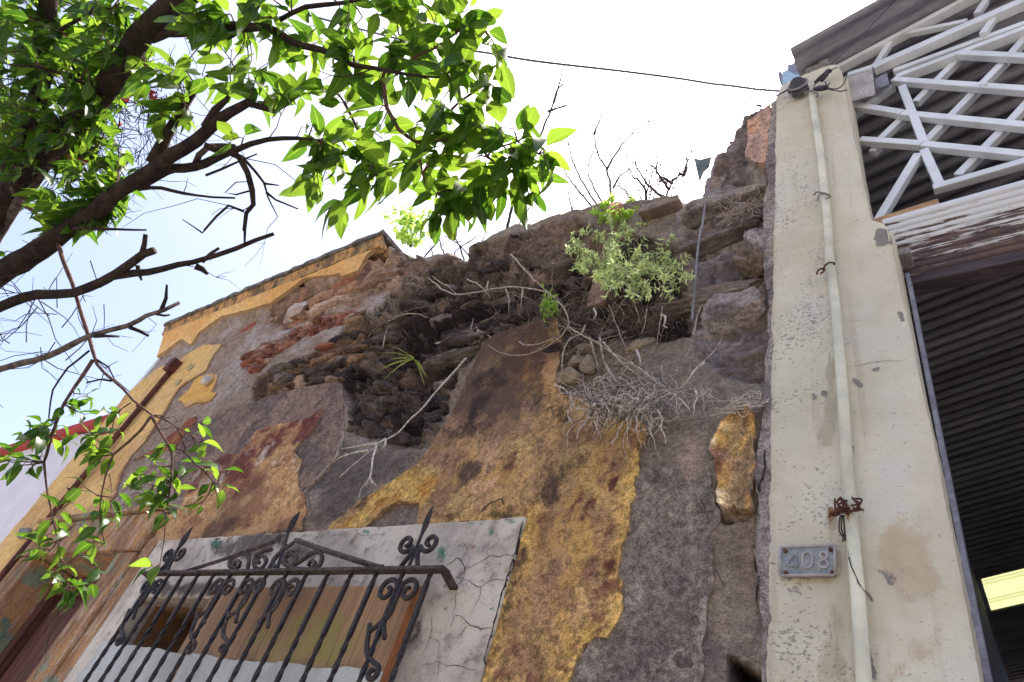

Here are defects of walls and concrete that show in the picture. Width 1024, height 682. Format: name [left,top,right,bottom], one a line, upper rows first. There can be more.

peeling [0,104,772,682]
crack [422,498,523,678]